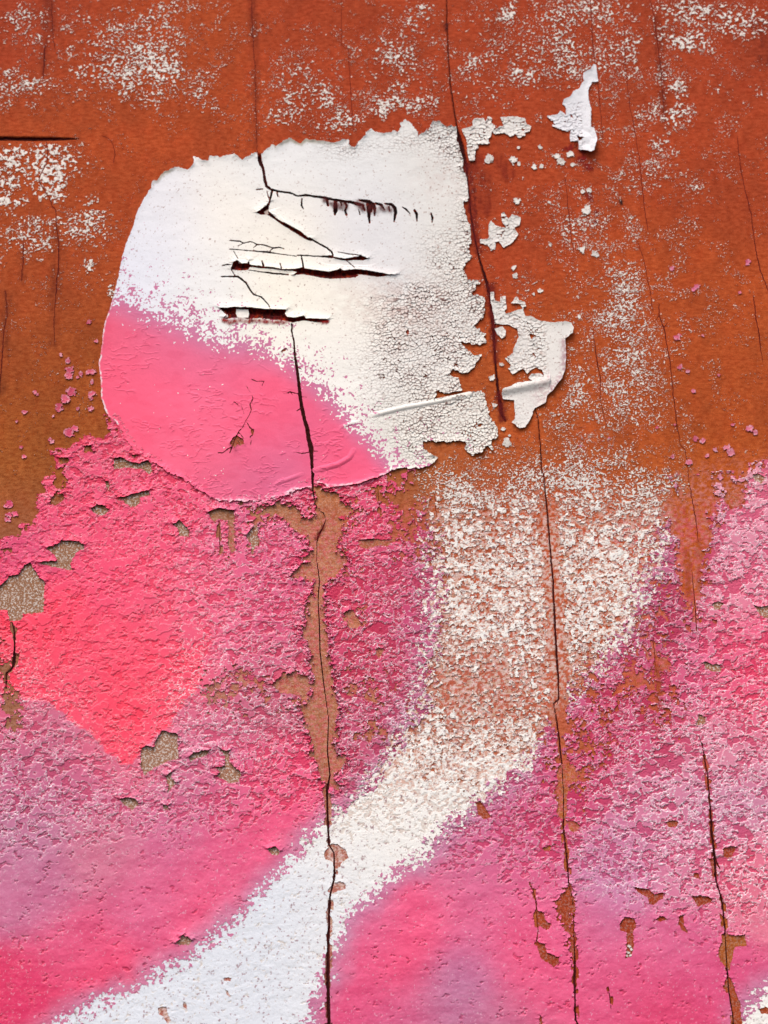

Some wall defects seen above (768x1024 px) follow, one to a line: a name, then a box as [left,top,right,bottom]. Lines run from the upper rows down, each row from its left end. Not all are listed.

peeling [0,0,284,130]
corrosion [323,197,392,213]
corrosion [463,163,480,248]
crack [446,0,506,421]
corrosion [565,144,593,170]
corrosion [486,286,498,360]
peeling [50,0,768,832]
peeling [0,540,84,621]
crack [288,325,336,1024]
crack [535,408,578,1024]
peeling [535,883,578,968]
crack [699,737,734,1024]